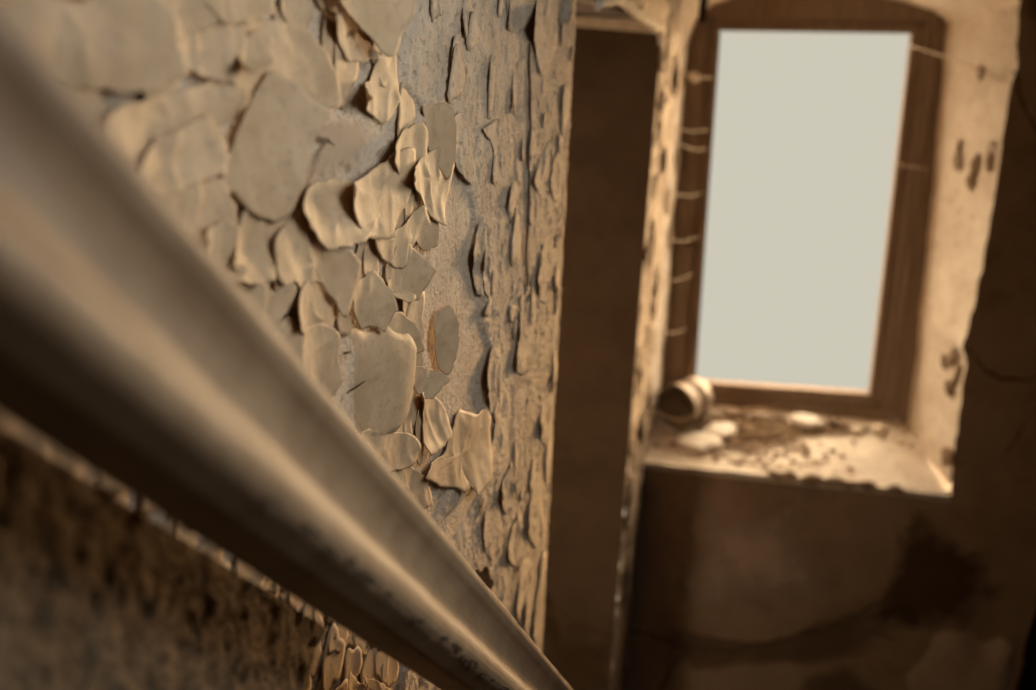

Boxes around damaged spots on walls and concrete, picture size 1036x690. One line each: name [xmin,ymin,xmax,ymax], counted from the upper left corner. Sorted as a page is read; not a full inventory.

peeling [506,0,572,75]
peeling [534,139,563,202]
peeling [3,0,545,651]
peeling [516,236,554,376]
peeling [541,378,552,449]
water stain [879,523,991,627]
peeling [335,670,392,690]